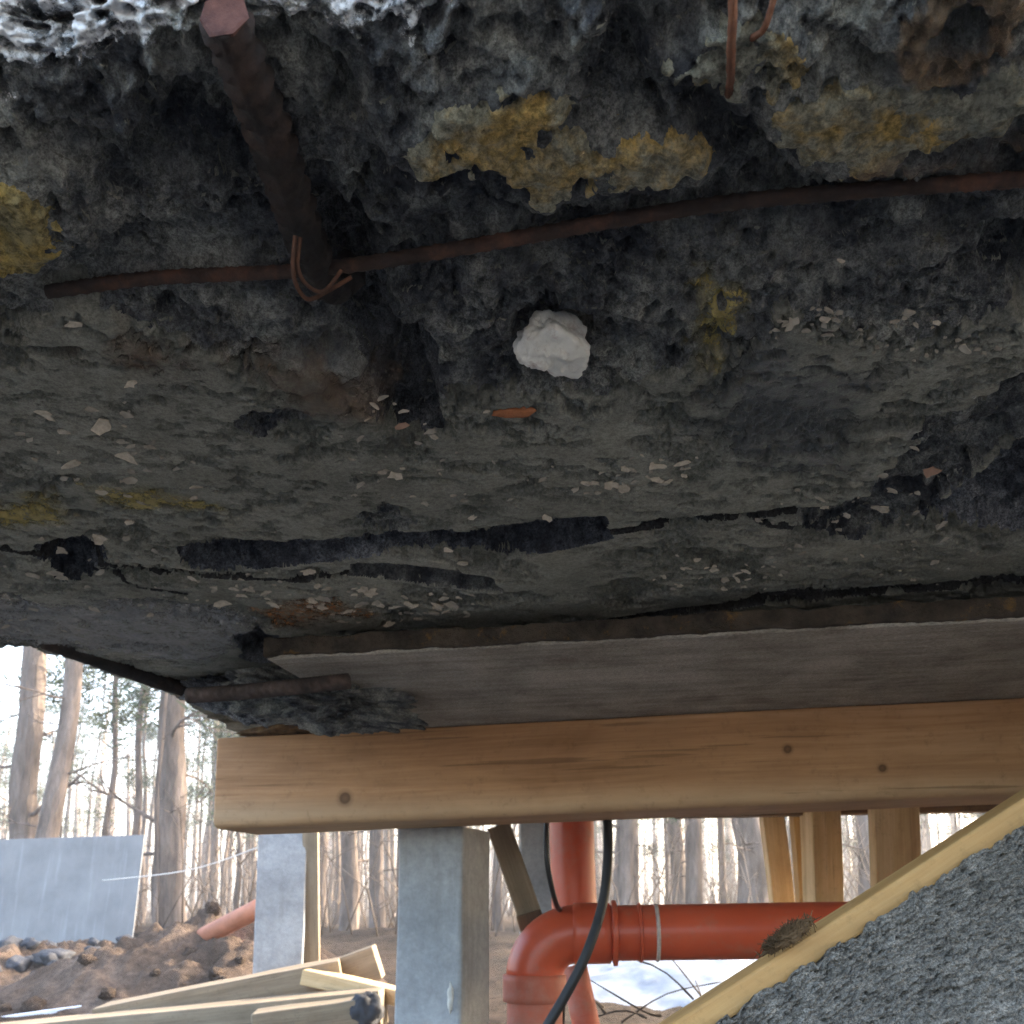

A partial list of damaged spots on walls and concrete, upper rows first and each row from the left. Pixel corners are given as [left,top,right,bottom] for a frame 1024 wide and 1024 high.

spalling [0,0,1024,430]
peeling [33,410,71,434]
peeling [233,407,313,438]
peeling [414,423,439,445]
peeling [85,401,164,505]
peeling [348,456,405,497]
crack [610,506,810,535]
crack [0,538,59,558]
crack [86,541,349,595]